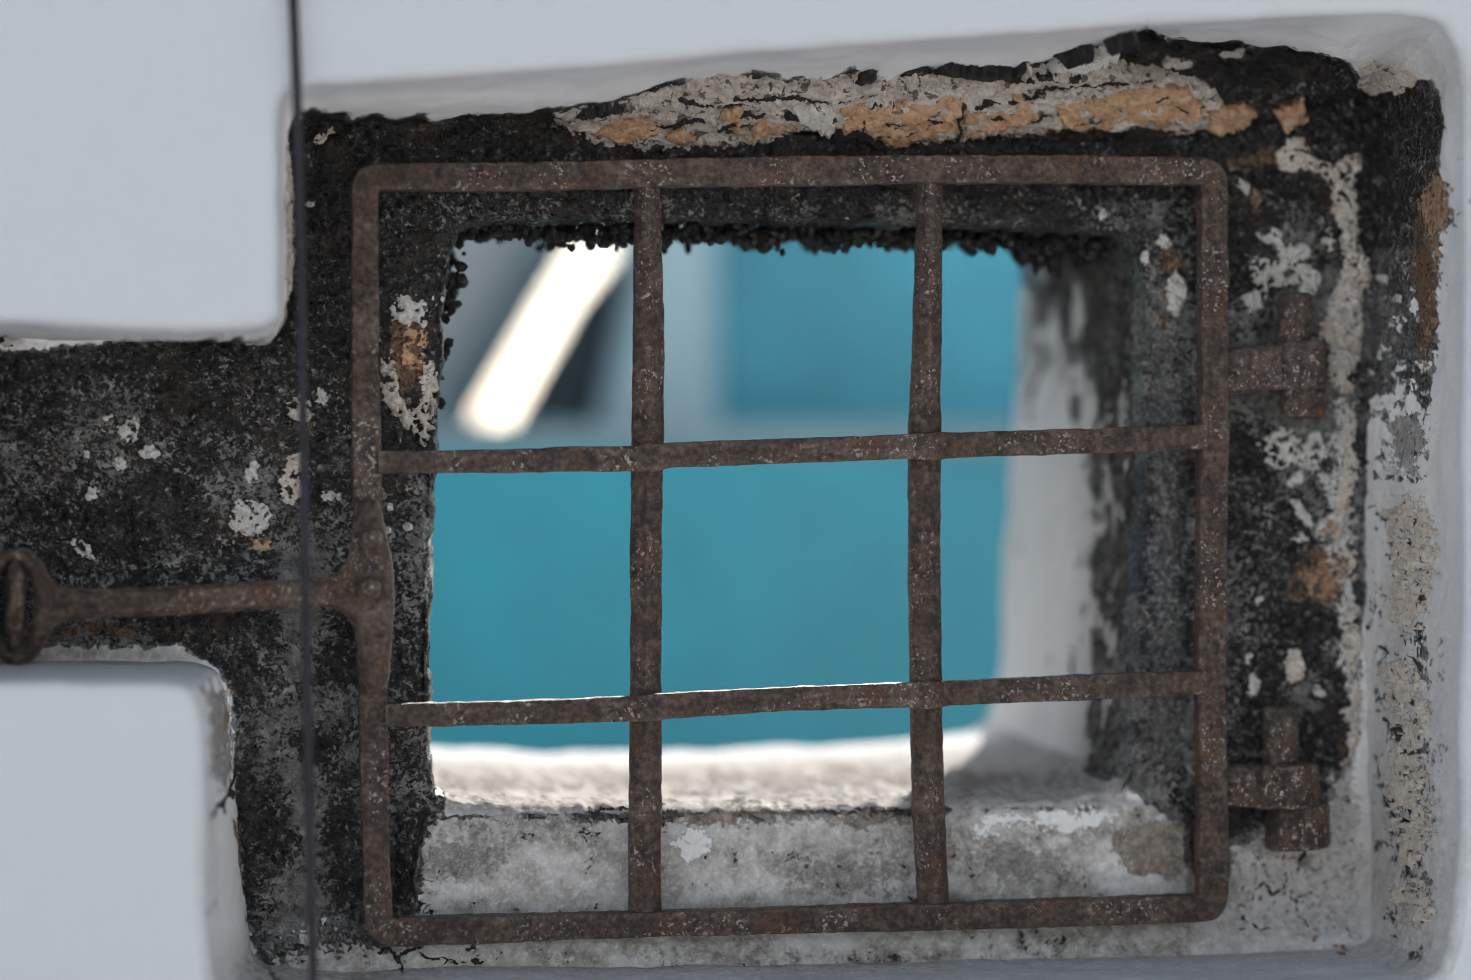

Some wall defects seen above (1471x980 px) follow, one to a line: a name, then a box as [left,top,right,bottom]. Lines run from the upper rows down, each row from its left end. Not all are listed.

spalling [380,294,445,448]
damp [1138,324,1192,427]
spalling [552,30,1454,944]
damp [1137,450,1192,672]
spalling [201,678,236,796]
damp [1137,695,1191,764]
crack [210,775,252,923]
damp [422,764,629,878]
damp [662,761,912,832]
damp [983,846,1070,882]
damp [1112,821,1190,881]